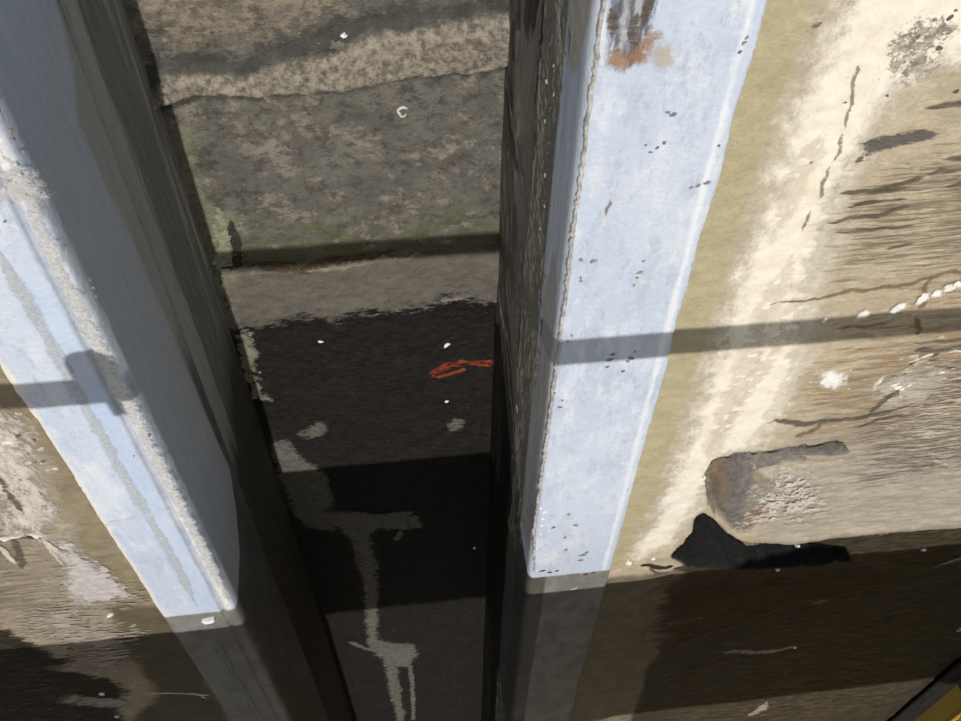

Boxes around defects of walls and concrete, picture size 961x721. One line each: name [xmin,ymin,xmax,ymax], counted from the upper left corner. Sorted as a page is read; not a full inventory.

corrosion [607,0,672,71]
leakage [627,0,961,563]
crack [771,269,961,335]
crack [0,534,71,569]
leakage [269,439,424,721]
spalling [671,440,852,572]